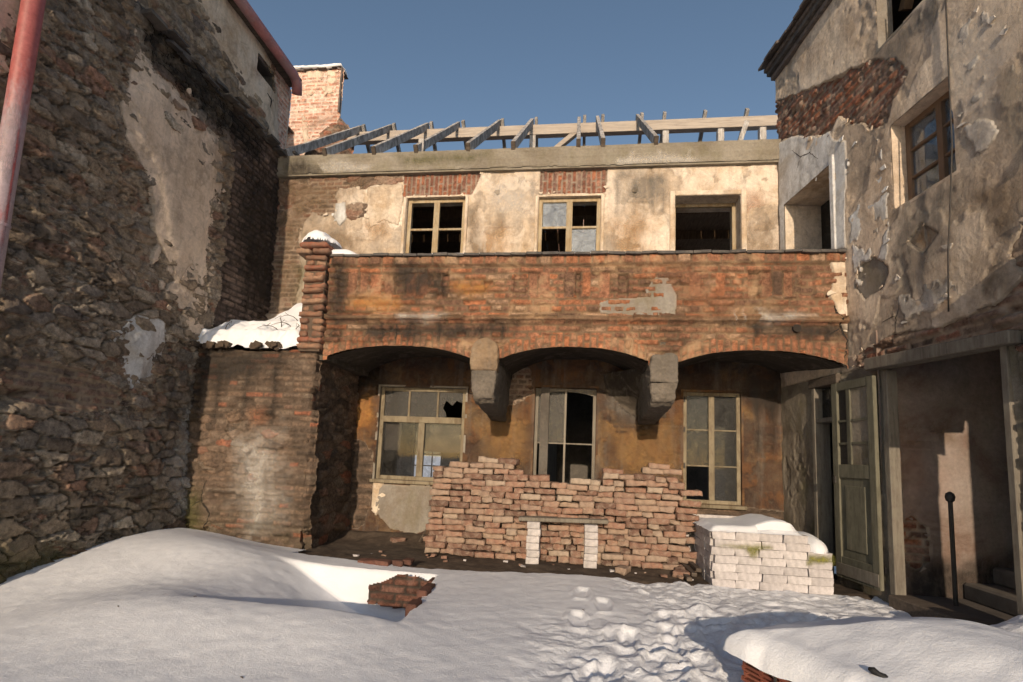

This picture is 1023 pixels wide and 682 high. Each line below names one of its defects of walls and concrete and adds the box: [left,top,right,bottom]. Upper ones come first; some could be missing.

flaking render [0,0,20,74]
peeling [0,104,21,221]
flaking render [119,28,226,342]
flaking render [268,172,484,314]
flaking render [775,57,908,332]
flaking render [852,217,1023,368]
peeling [956,112,999,157]
flaking render [109,315,166,394]
flaking render [903,516,931,572]